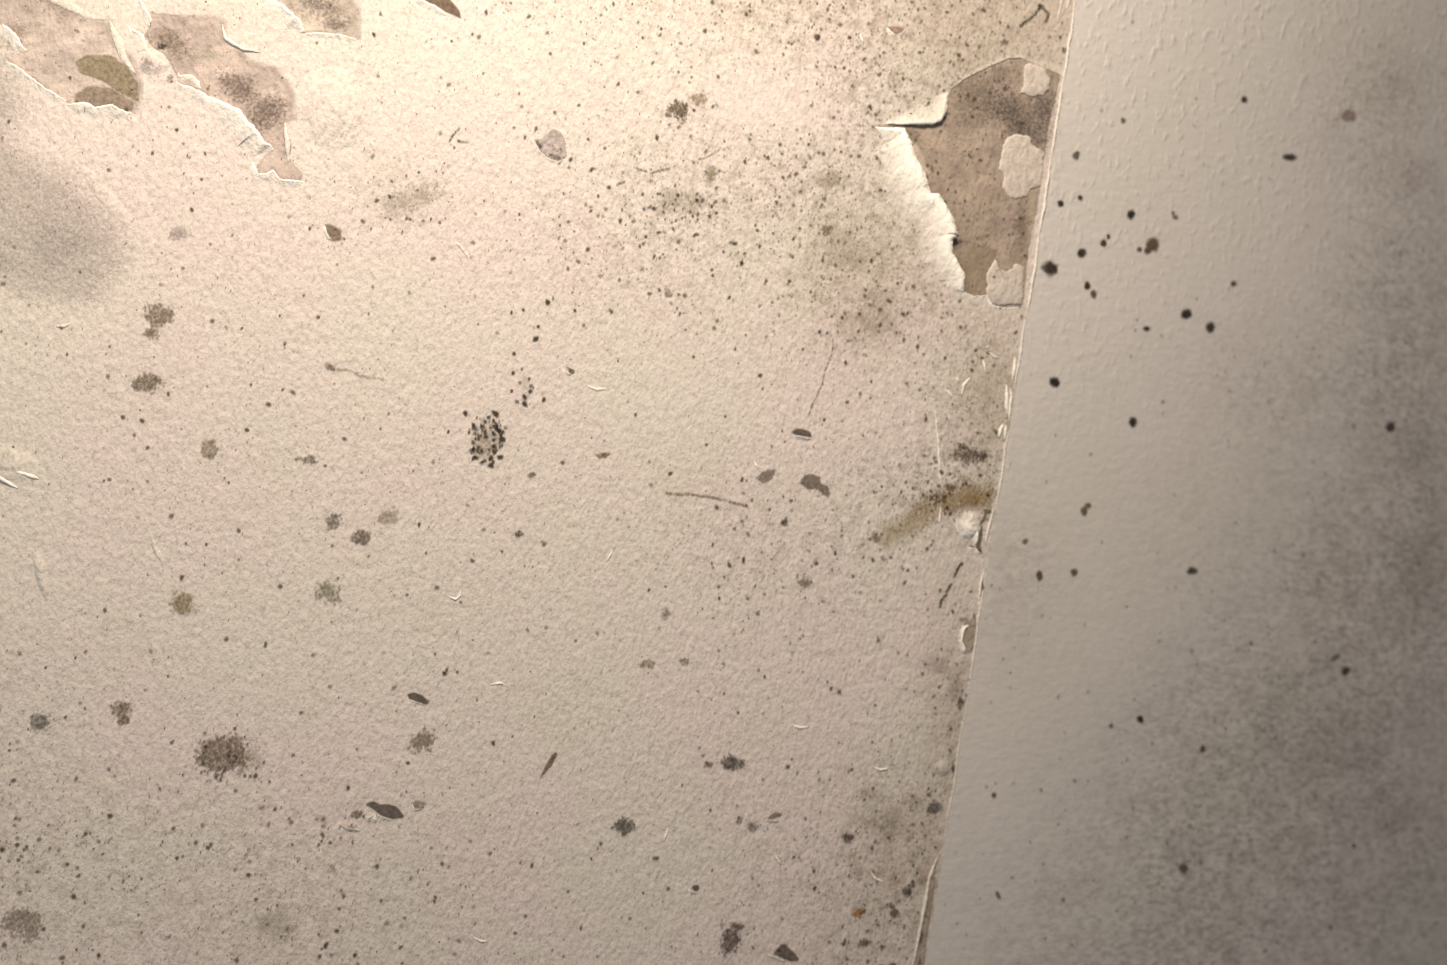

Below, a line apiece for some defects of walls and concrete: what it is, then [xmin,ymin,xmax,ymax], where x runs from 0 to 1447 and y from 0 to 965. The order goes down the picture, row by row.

peeling [262,0,359,42]
peeling [414,0,461,18]
peeling [0,0,305,188]
damp [349,128,474,234]
peeling [873,0,1075,843]